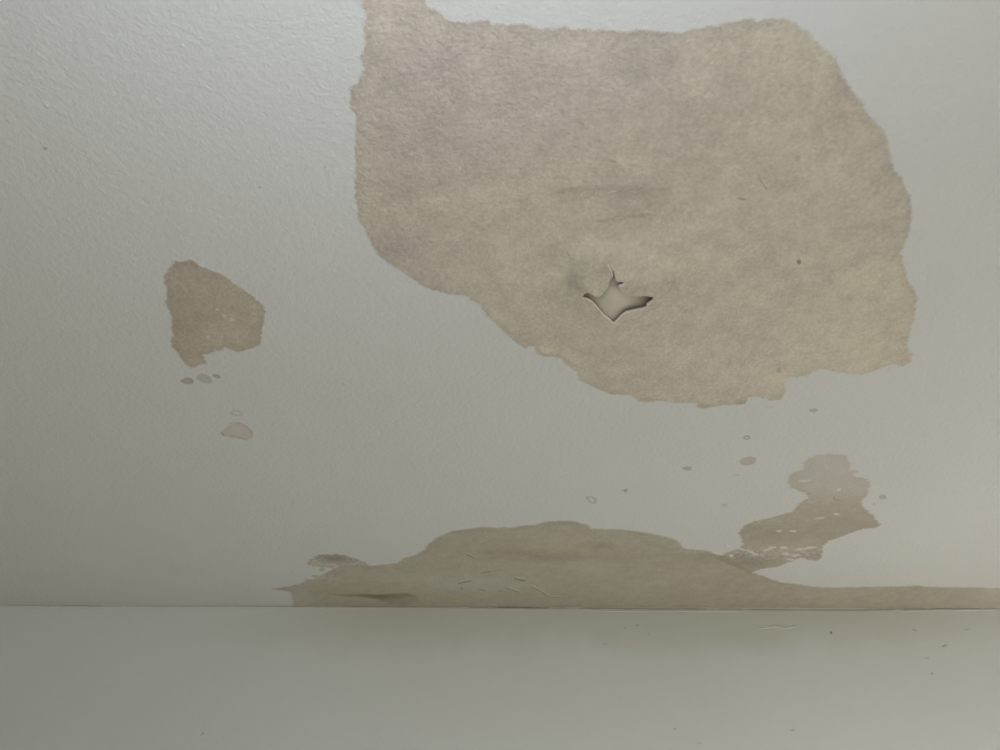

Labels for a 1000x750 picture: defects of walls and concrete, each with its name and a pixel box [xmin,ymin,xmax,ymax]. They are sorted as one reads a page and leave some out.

damp [343,0,925,411]
damp [157,256,272,385]
damp [266,450,1000,609]